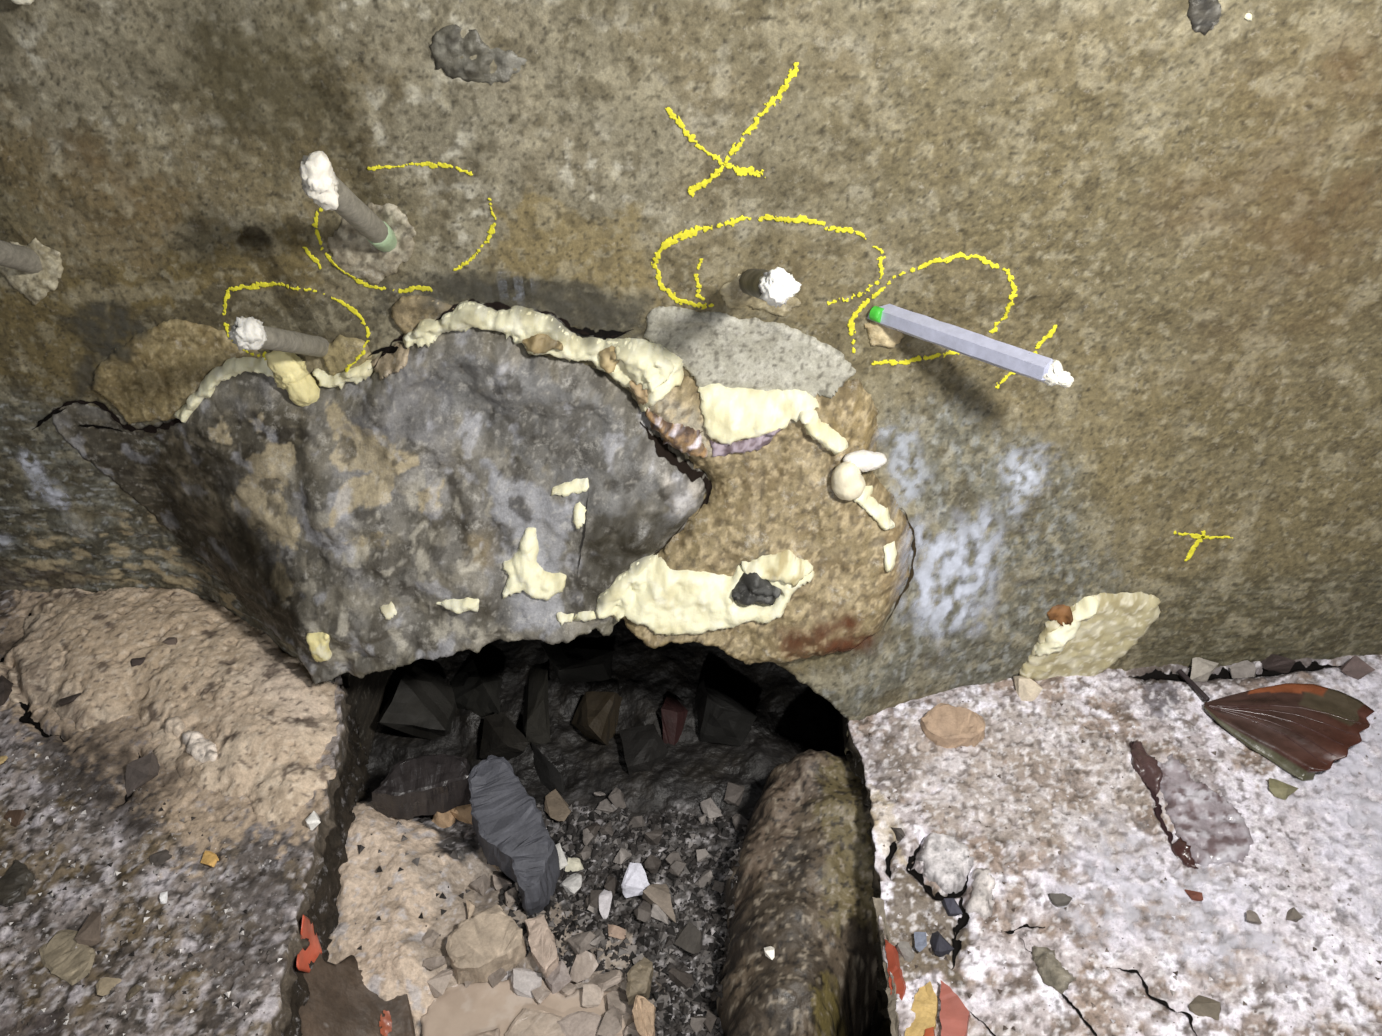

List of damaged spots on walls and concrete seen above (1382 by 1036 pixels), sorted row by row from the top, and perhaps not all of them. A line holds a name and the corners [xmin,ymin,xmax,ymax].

peeling [91,319,263,424]
peeling [322,295,454,381]
crack [32,400,183,433]
spalling [629,380,707,458]
leakage [884,431,920,497]
leakage [1008,454,1039,510]
peeling [742,550,813,587]
leakage [907,513,994,627]
crack [19,702,66,742]
crack [885,837,1045,969]
crack [1062,994,1097,1036]
crack [1107,967,1197,1036]